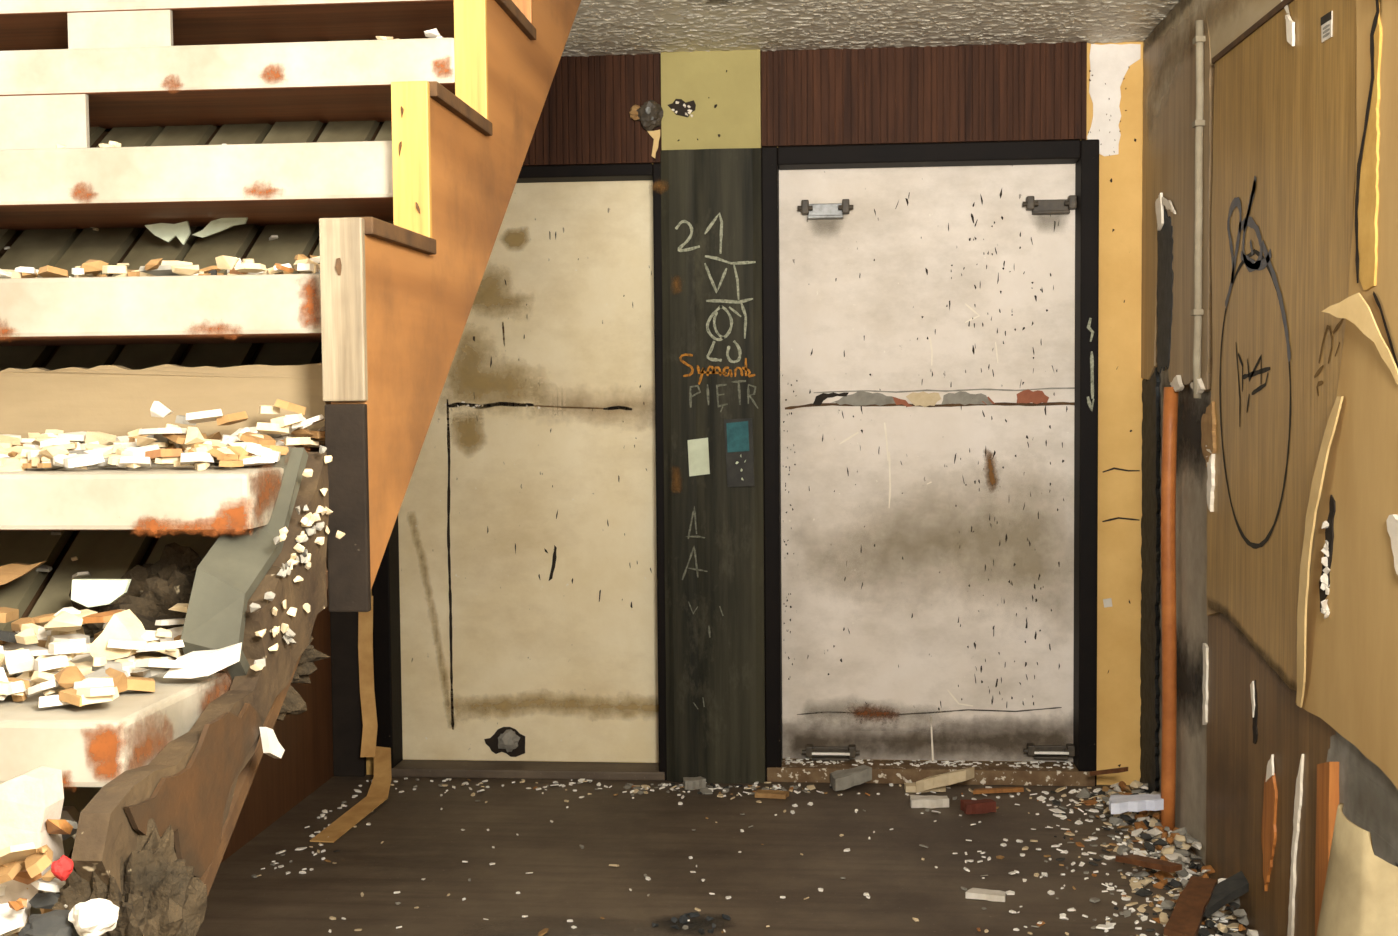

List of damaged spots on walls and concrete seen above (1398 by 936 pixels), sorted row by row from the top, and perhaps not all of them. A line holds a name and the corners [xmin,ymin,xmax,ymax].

peeling [1087,44,1141,156]
crack [1355,0,1398,369]
corrosion [300,279,320,326]
flaking render [951,194,1054,377]
corrosion [986,452,997,488]
corrosion [135,470,281,535]
damp [928,516,1046,578]
damp [469,697,658,715]
corrosion [85,721,172,779]
spalling [484,727,525,757]
damp [789,725,1073,759]
flaking render [1326,731,1398,867]